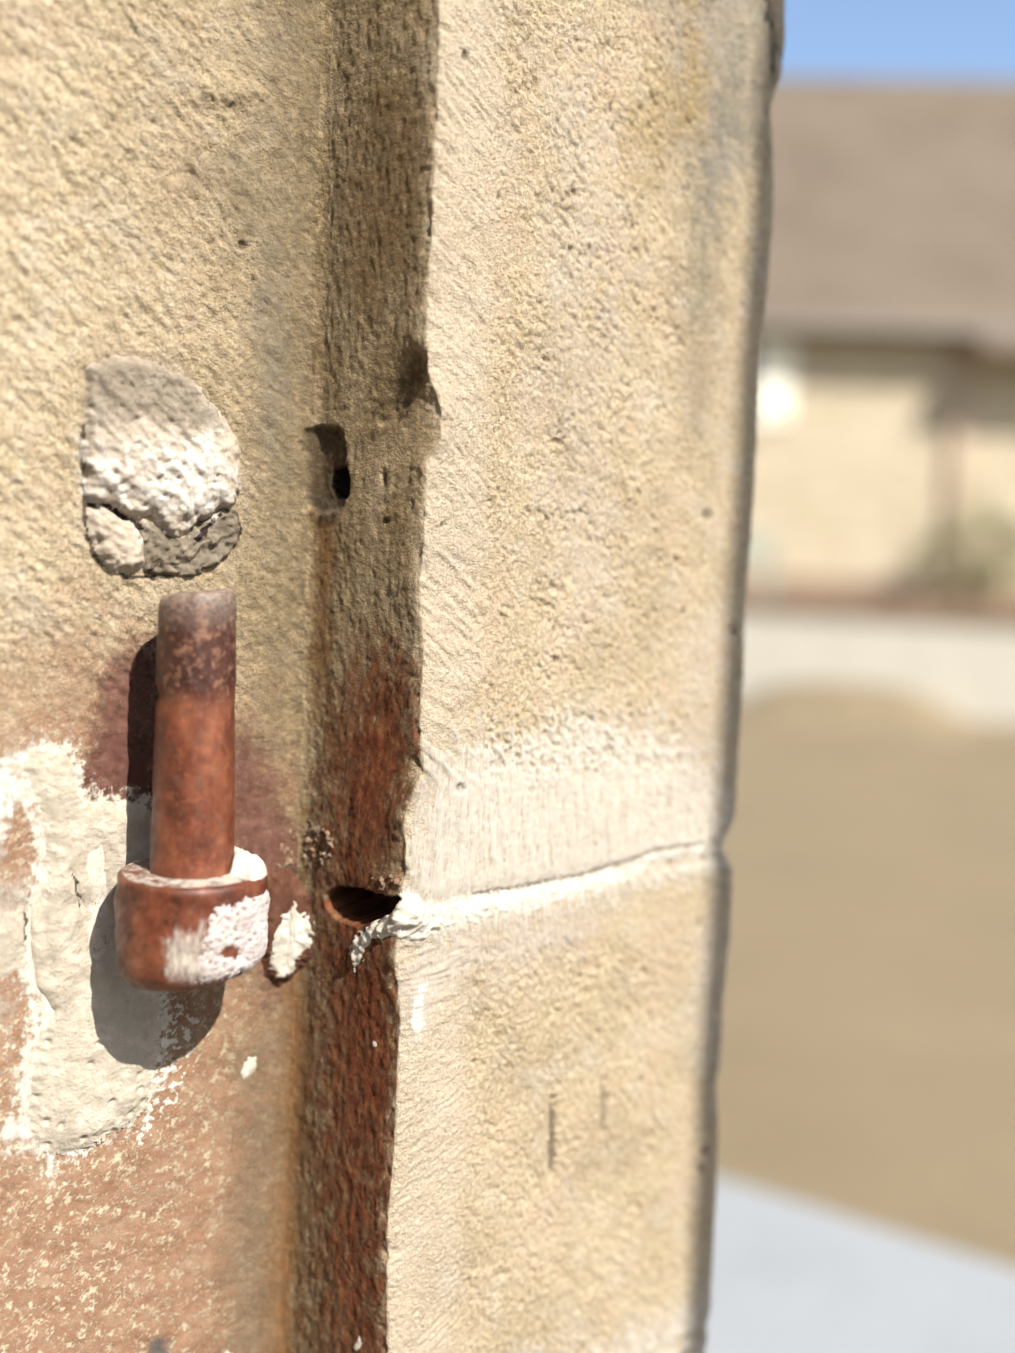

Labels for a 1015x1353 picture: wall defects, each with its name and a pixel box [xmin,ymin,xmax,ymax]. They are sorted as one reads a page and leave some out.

corrosion [0,792,46,912]
spalling [331,886,399,921]
crack [480,845,697,895]
corrosion [235,634,422,1353]
corrosion [0,962,284,1353]